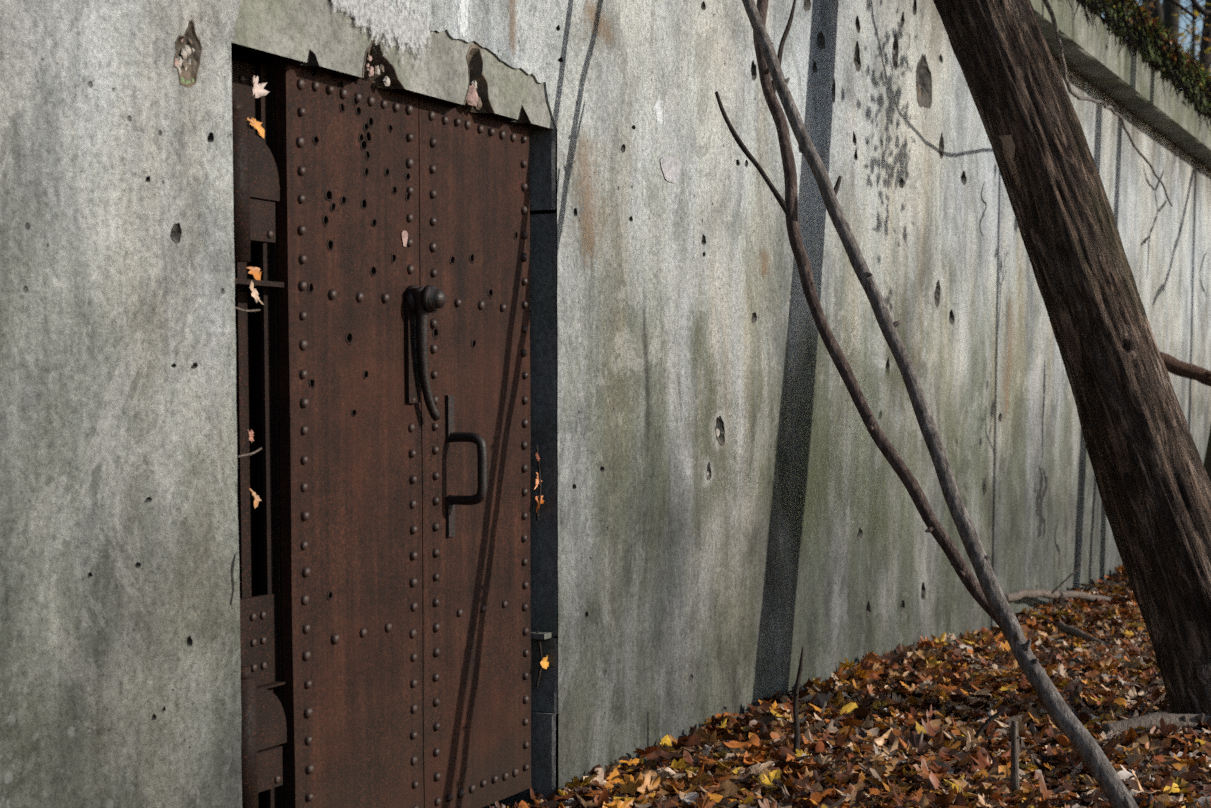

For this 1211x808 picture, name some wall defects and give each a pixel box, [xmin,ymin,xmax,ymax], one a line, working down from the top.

spalling [174,19,202,87]
flaking render [231,0,553,129]
spalling [916,53,943,108]
spalling [716,416,725,446]